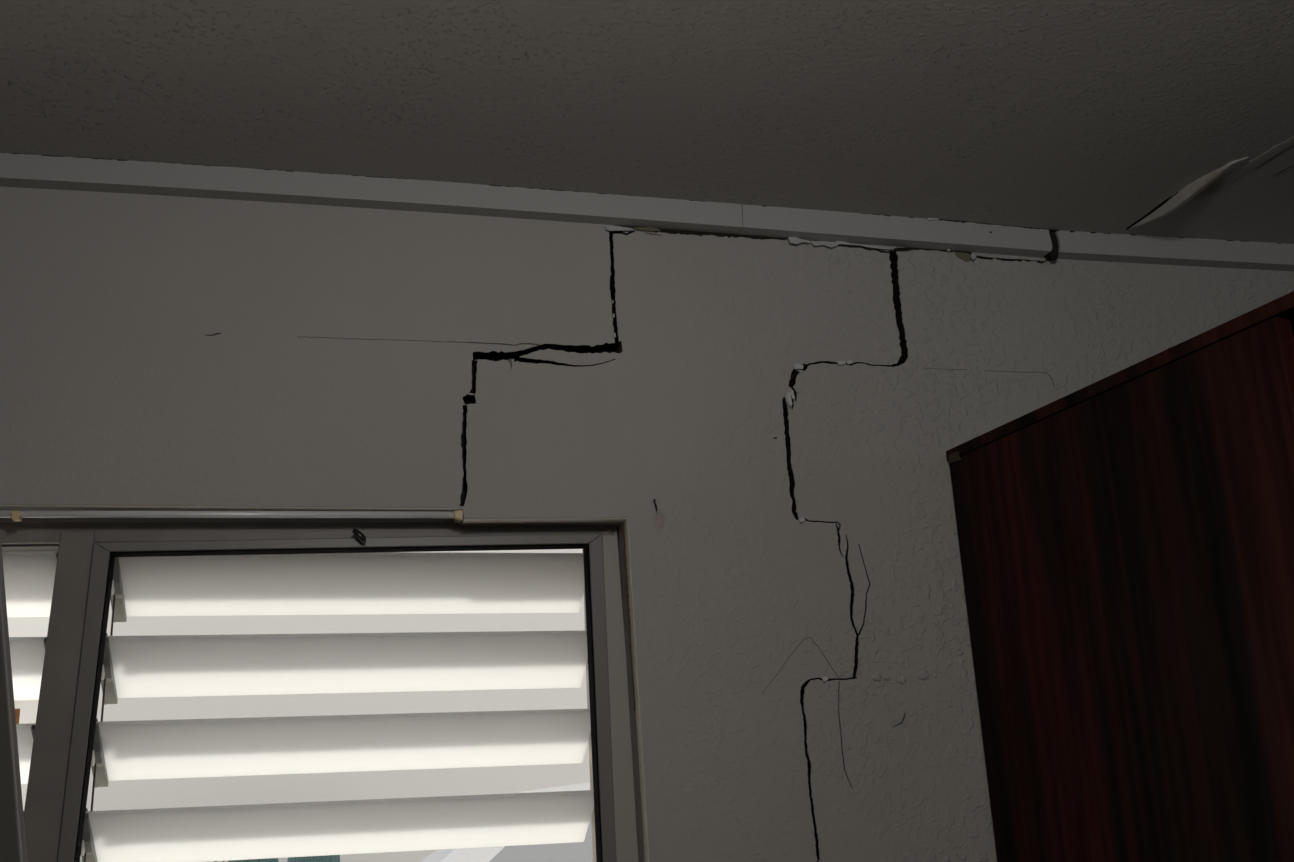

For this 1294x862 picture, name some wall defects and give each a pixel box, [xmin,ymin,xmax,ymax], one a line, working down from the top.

crack [297,185,1184,862]